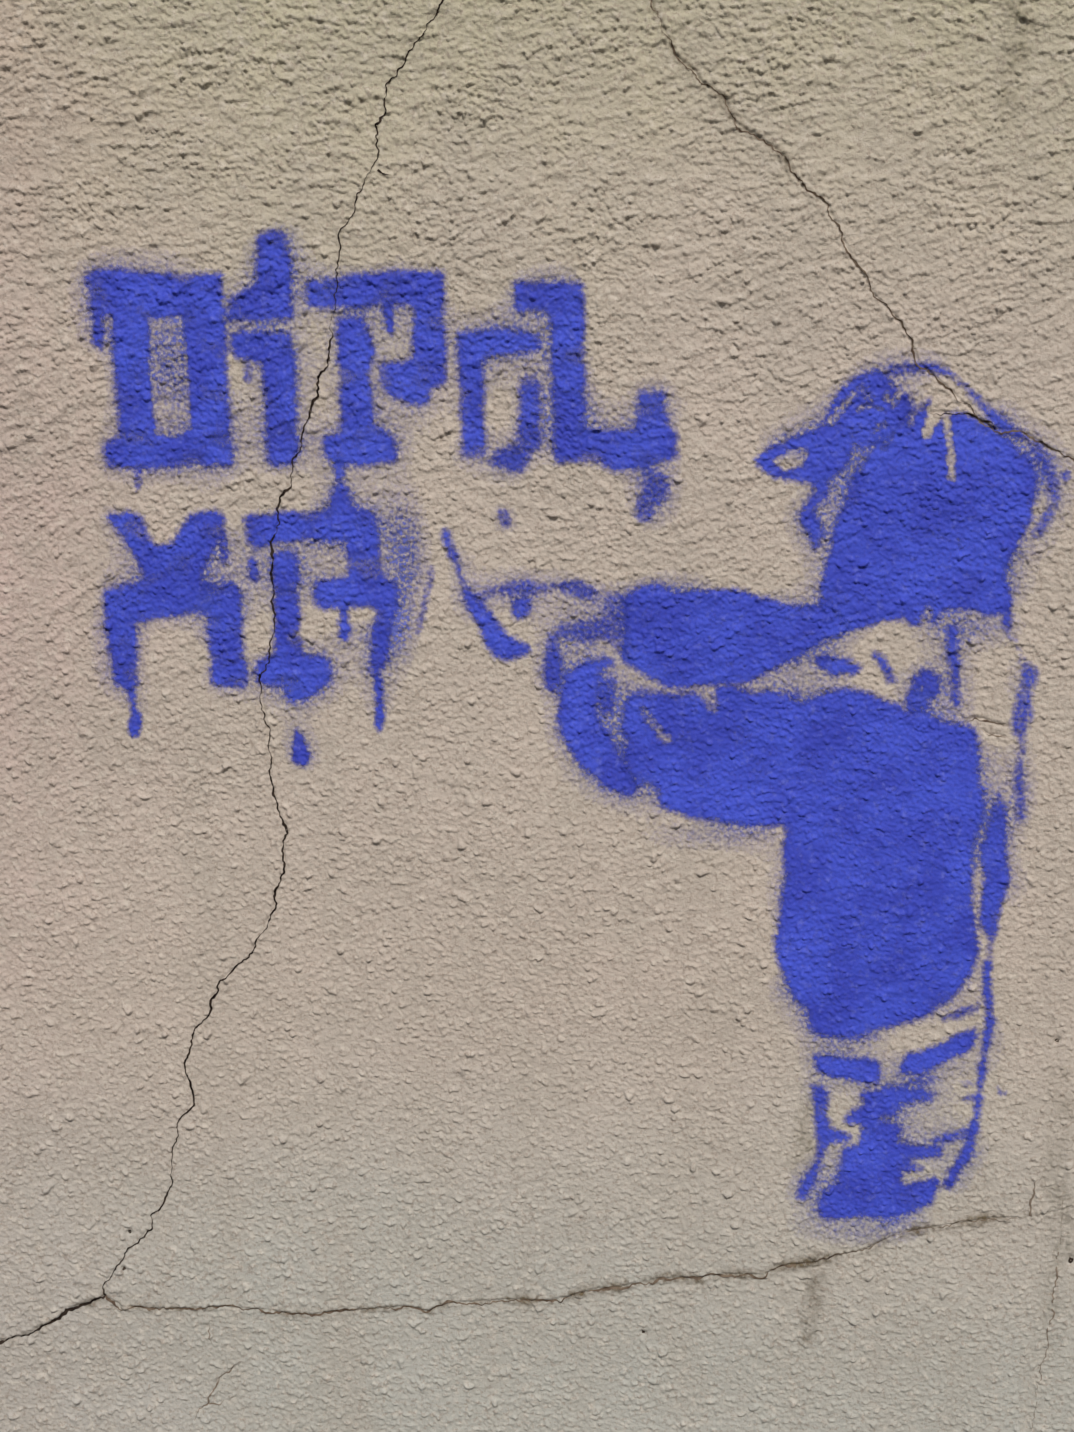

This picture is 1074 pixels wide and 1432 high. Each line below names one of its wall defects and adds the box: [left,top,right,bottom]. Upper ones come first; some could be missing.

crack [258,0,444,695]
crack [650,0,1074,461]
crack [0,701,1011,1345]
crack [1019,1181,1039,1220]
crack [1032,1235,1062,1427]